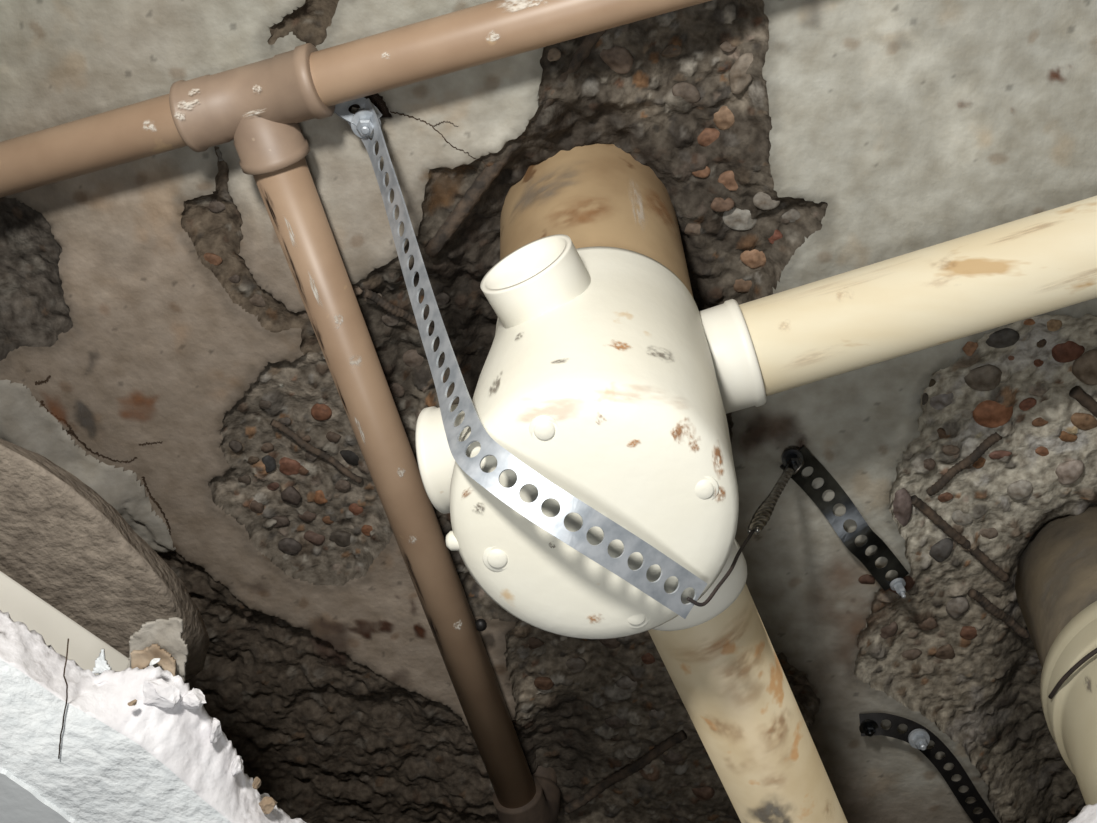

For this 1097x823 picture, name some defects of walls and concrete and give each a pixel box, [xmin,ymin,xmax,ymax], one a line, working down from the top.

spalling [267,0,339,47]
spalling [0,197,73,361]
spalling [181,146,393,586]
spalling [348,0,828,465]
flaking render [92,649,112,674]
spalling [128,550,501,823]
spalling [433,506,741,823]
spalling [773,647,820,727]
spalling [854,314,1097,823]